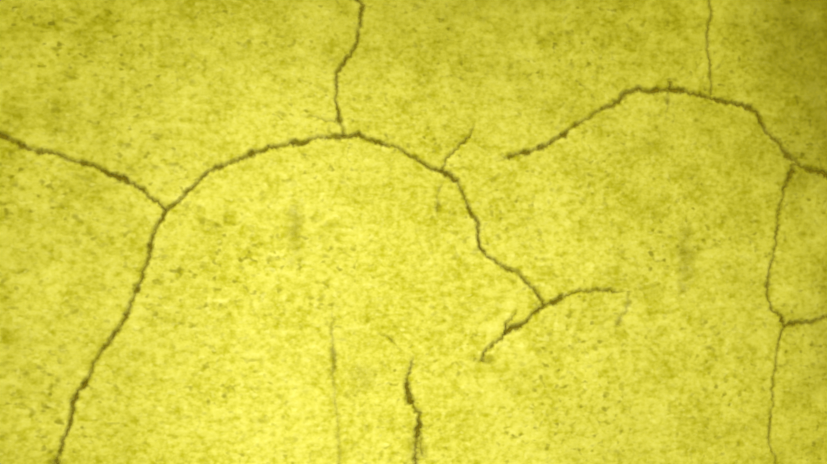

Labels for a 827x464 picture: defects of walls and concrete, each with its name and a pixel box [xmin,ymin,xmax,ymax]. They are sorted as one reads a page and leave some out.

crack [604,81,827,191]
crack [0,0,579,464]
crack [766,264,823,337]